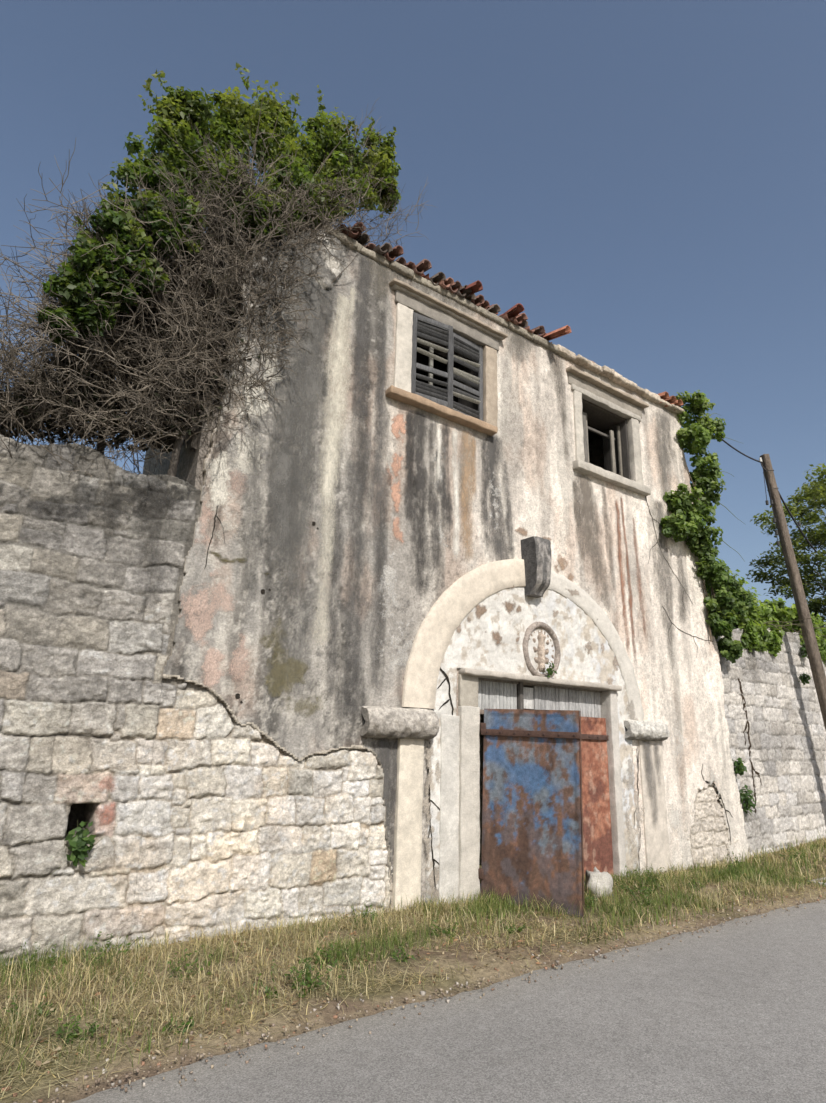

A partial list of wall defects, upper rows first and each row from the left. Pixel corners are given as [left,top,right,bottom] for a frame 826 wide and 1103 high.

water stain [245,228,395,712]
peeling [388,453,403,542]
peeling [392,415,406,438]
water stain [405,412,460,588]
water stain [482,435,514,560]
water stain [573,475,613,599]
rust [616,498,645,646]
water stain [657,415,670,483]
water stain [653,502,687,661]
flaking render [681,780,739,868]